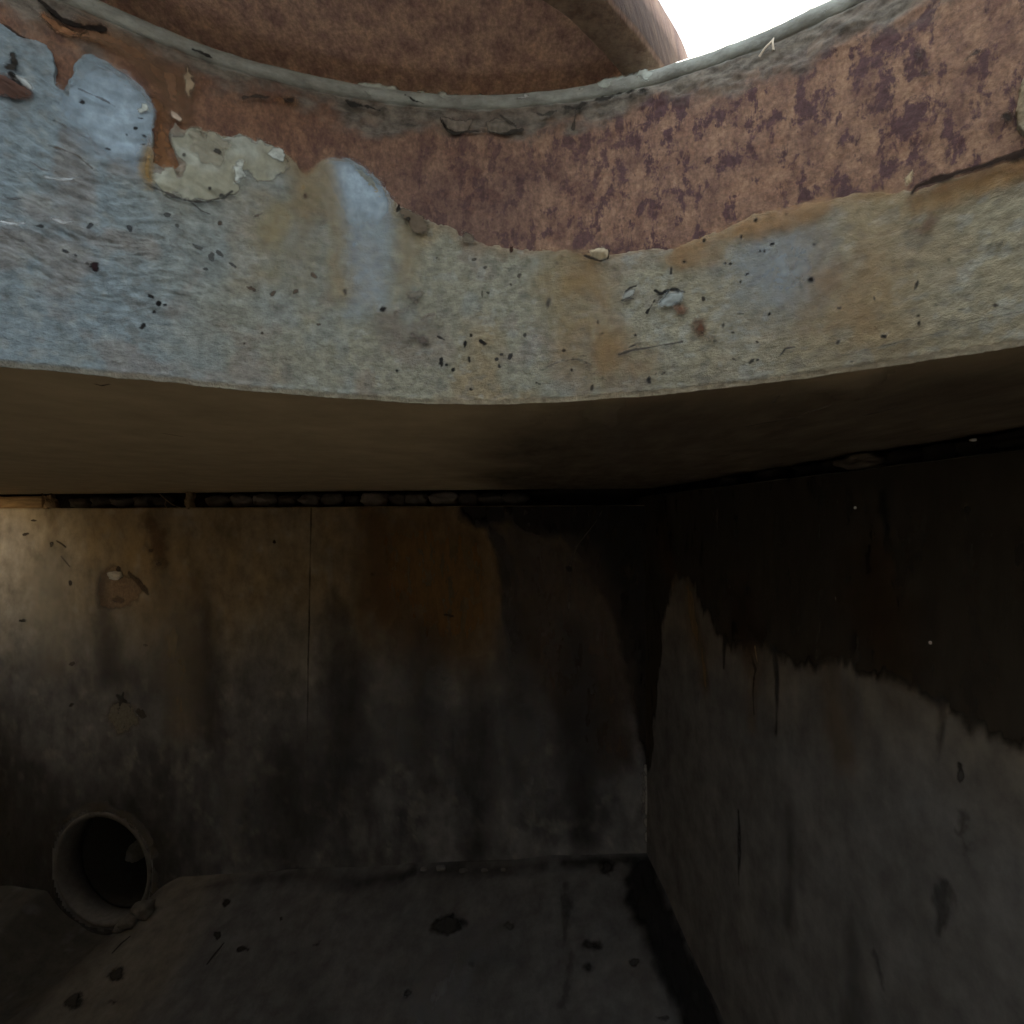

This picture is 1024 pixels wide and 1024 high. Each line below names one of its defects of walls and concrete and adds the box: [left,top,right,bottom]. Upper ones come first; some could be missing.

spalling [0,52,33,99]
spalling [905,148,1024,198]
hole [193,244,236,270]
peeling [583,248,610,262]
leakage [460,450,1024,842]
leakage [0,757,95,929]